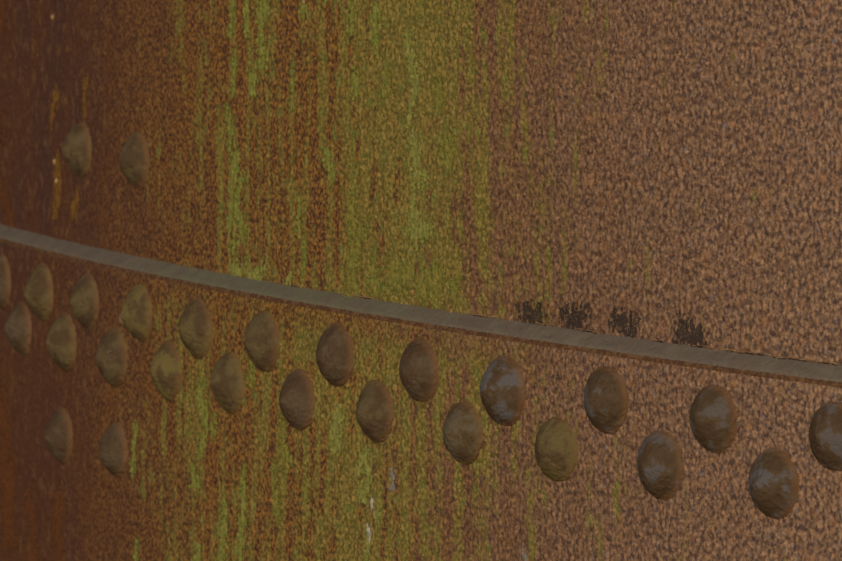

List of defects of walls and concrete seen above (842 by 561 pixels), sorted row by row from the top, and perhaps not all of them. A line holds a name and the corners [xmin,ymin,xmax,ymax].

rust [51,148,80,229]